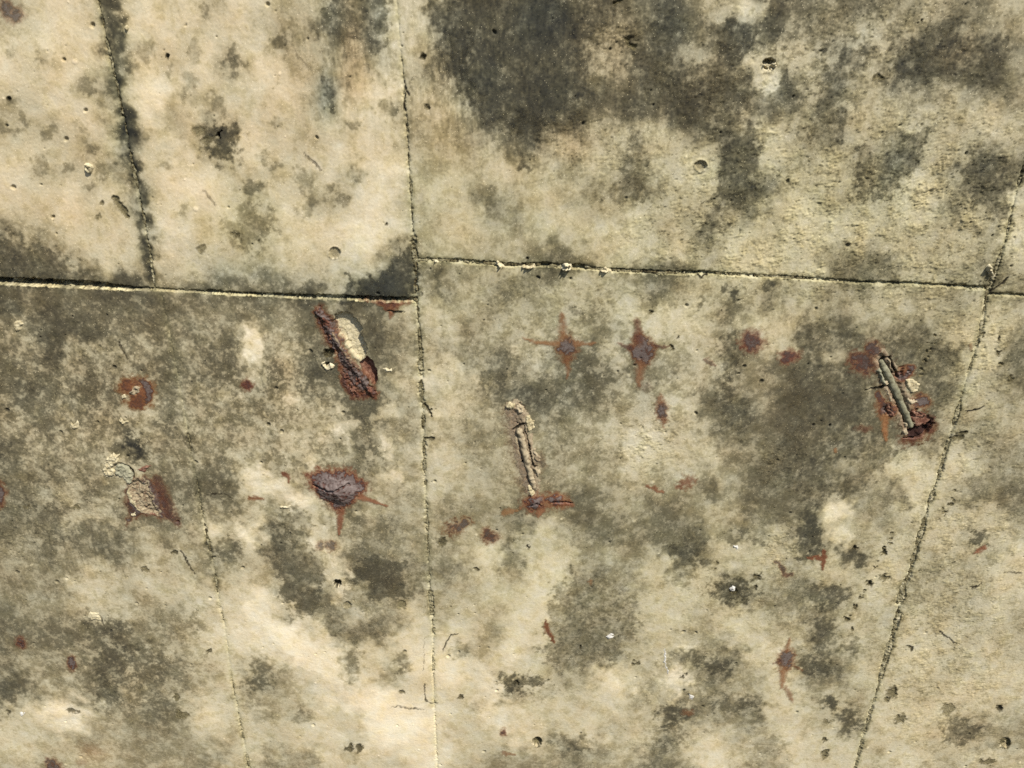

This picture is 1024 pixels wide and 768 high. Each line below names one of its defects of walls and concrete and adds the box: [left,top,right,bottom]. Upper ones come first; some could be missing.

damp [427,0,616,171]
damp [648,7,794,238]
corrosion [117,377,154,410]
spalling [102,453,180,525]
spalling [313,306,392,400]
spalling [505,399,541,497]
corrosion [525,313,596,377]
corrosion [619,319,666,386]
damp [712,330,757,443]
damp [763,319,954,502]
spalling [847,341,935,444]
corrosion [773,639,803,700]